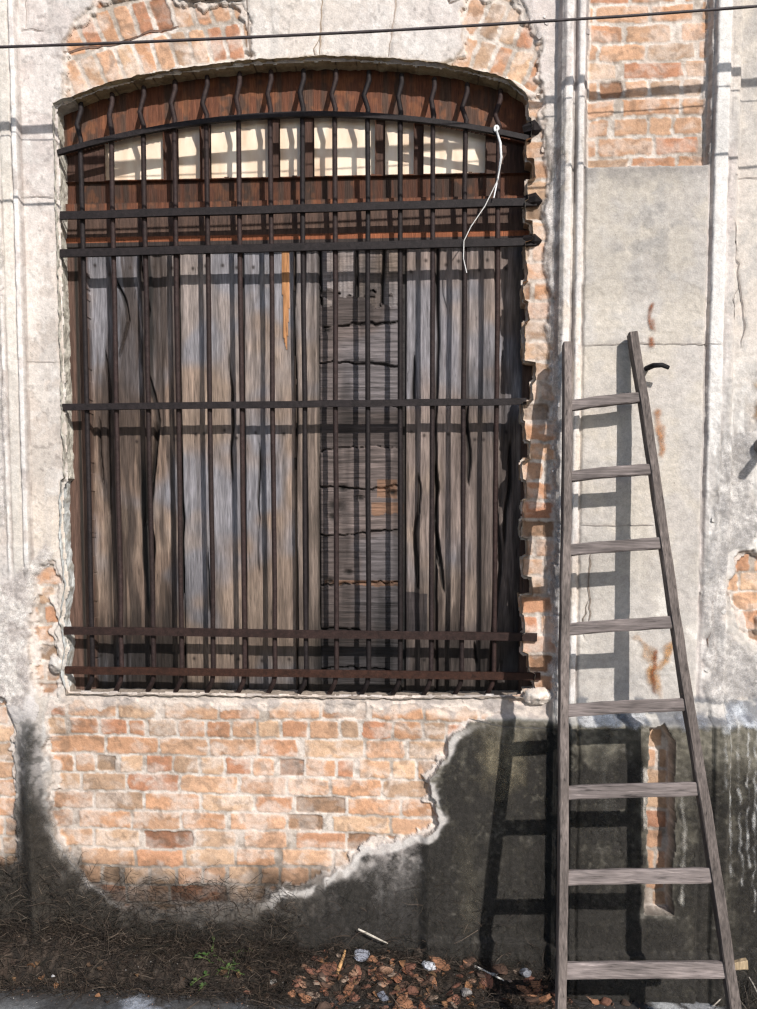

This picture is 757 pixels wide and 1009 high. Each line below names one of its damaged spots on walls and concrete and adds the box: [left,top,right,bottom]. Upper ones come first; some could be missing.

crack [64,26,178,53]
spalling [63,0,254,105]
crack [185,0,251,64]
crack [313,0,323,56]
spalling [586,0,709,168]
spalling [441,0,568,704]
spalling [0,546,495,912]
rust [646,644,673,692]
water stain [726,703,757,729]
water stain [0,726,720,989]
water stain [705,765,757,1004]
water stain [567,979,726,1008]